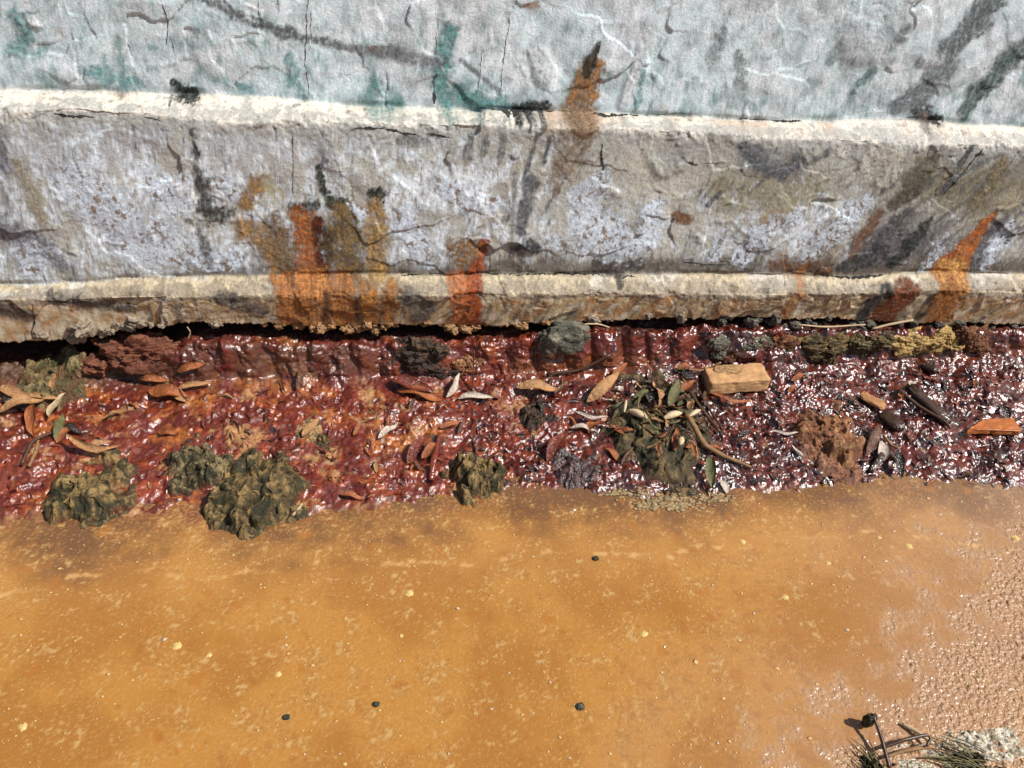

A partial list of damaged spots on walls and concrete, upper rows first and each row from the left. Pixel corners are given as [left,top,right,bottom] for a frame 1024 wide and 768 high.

crack [304,0,312,94]
damp [198,0,552,253]
corrosion [550,41,606,194]
damp [850,66,878,96]
damp [889,0,1007,134]
damp [957,40,1024,121]
damp [185,128,236,269]
corrosion [235,174,401,327]
corrosion [447,237,490,326]
corrosion [856,211,996,324]